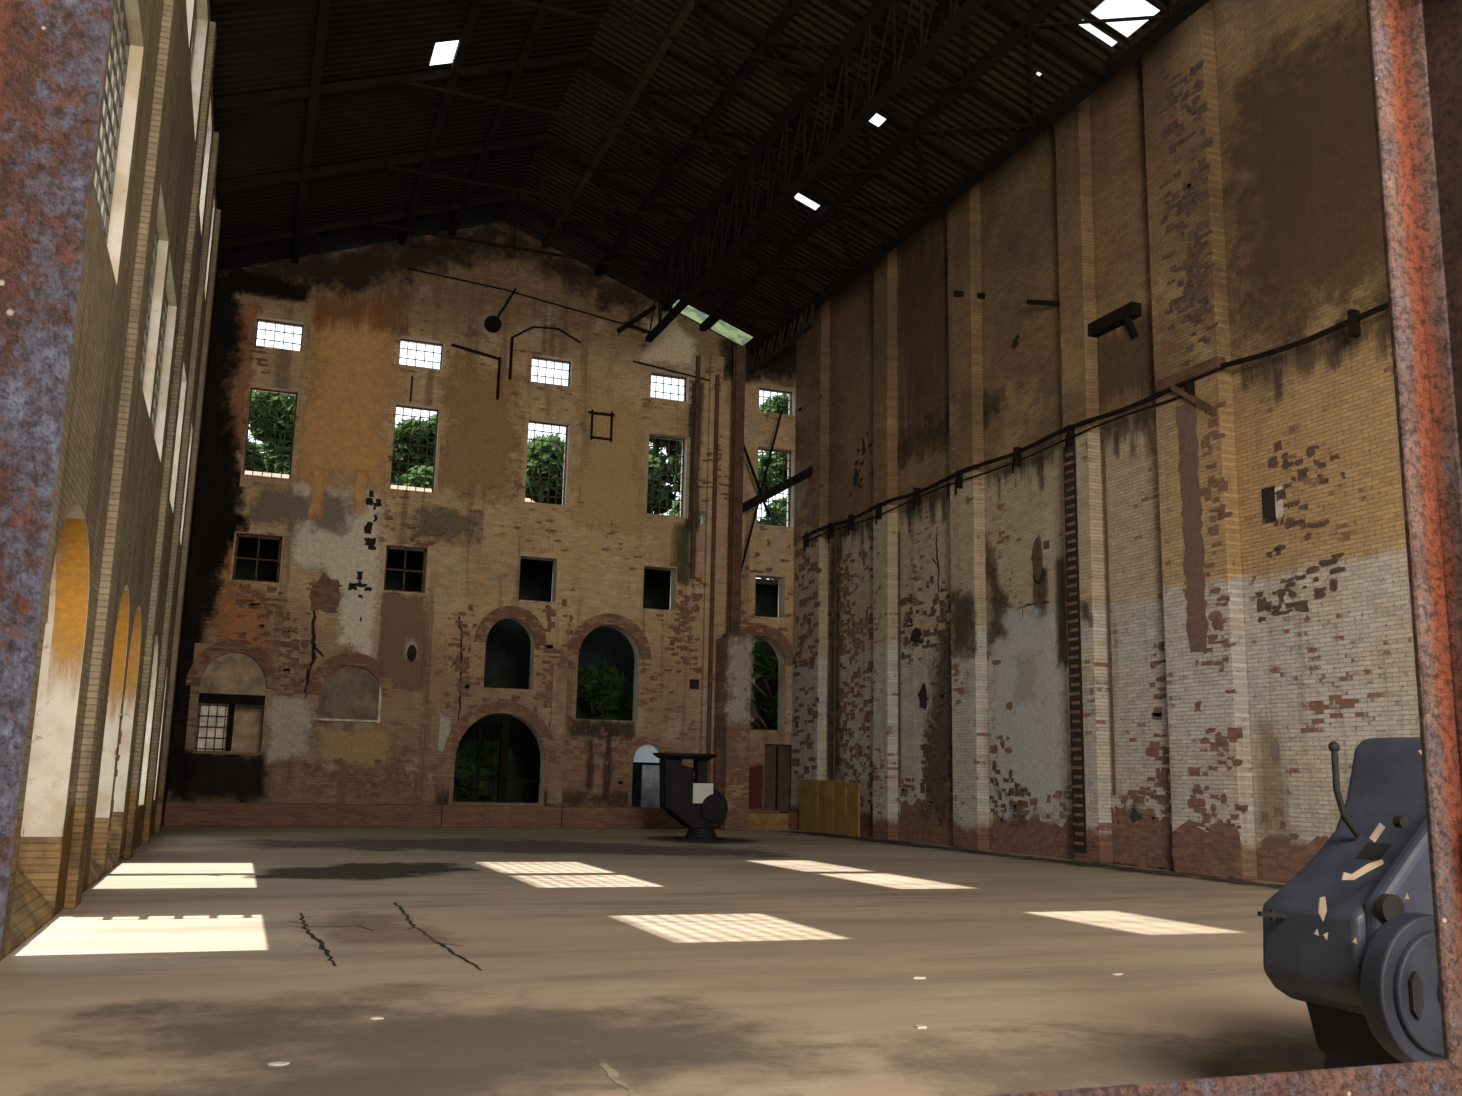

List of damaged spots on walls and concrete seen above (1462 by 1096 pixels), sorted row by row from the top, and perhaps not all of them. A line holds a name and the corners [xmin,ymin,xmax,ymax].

leakage [1223,0,1390,402]
spalling [364,490,382,550]
spalling [1031,536,1050,584]
flaking render [1175,400,1237,672]
peeling [1255,552,1346,623]
spalling [1262,440,1346,558]
crack [302,611,324,700]
flaking render [898,576,953,845]
flaking render [989,702,1074,860]
flaking render [1111,642,1329,882]
crack [290,903,482,970]